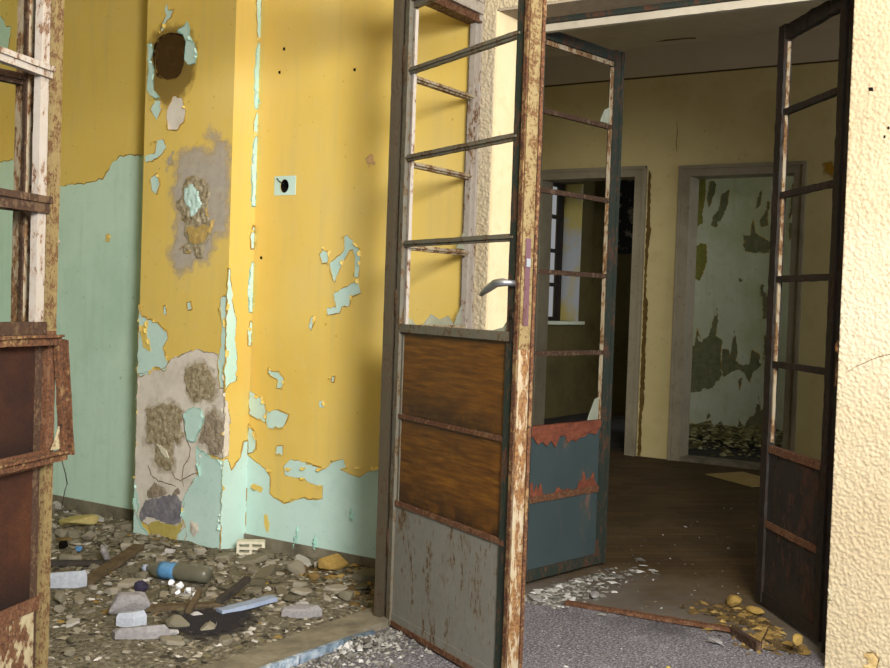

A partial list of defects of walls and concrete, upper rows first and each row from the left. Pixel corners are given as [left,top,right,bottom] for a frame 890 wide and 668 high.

peeling [0,0,18,52]
peeling [177,21,198,65]
peeling [0,82,16,163]
peeling [60,0,186,186]
peeling [251,0,262,207]
peeling [151,173,161,195]
flaking render [177,175,215,259]
peeling [319,235,361,317]
peeling [689,177,773,442]
peeling [775,176,794,444]
peeling [132,262,379,559]